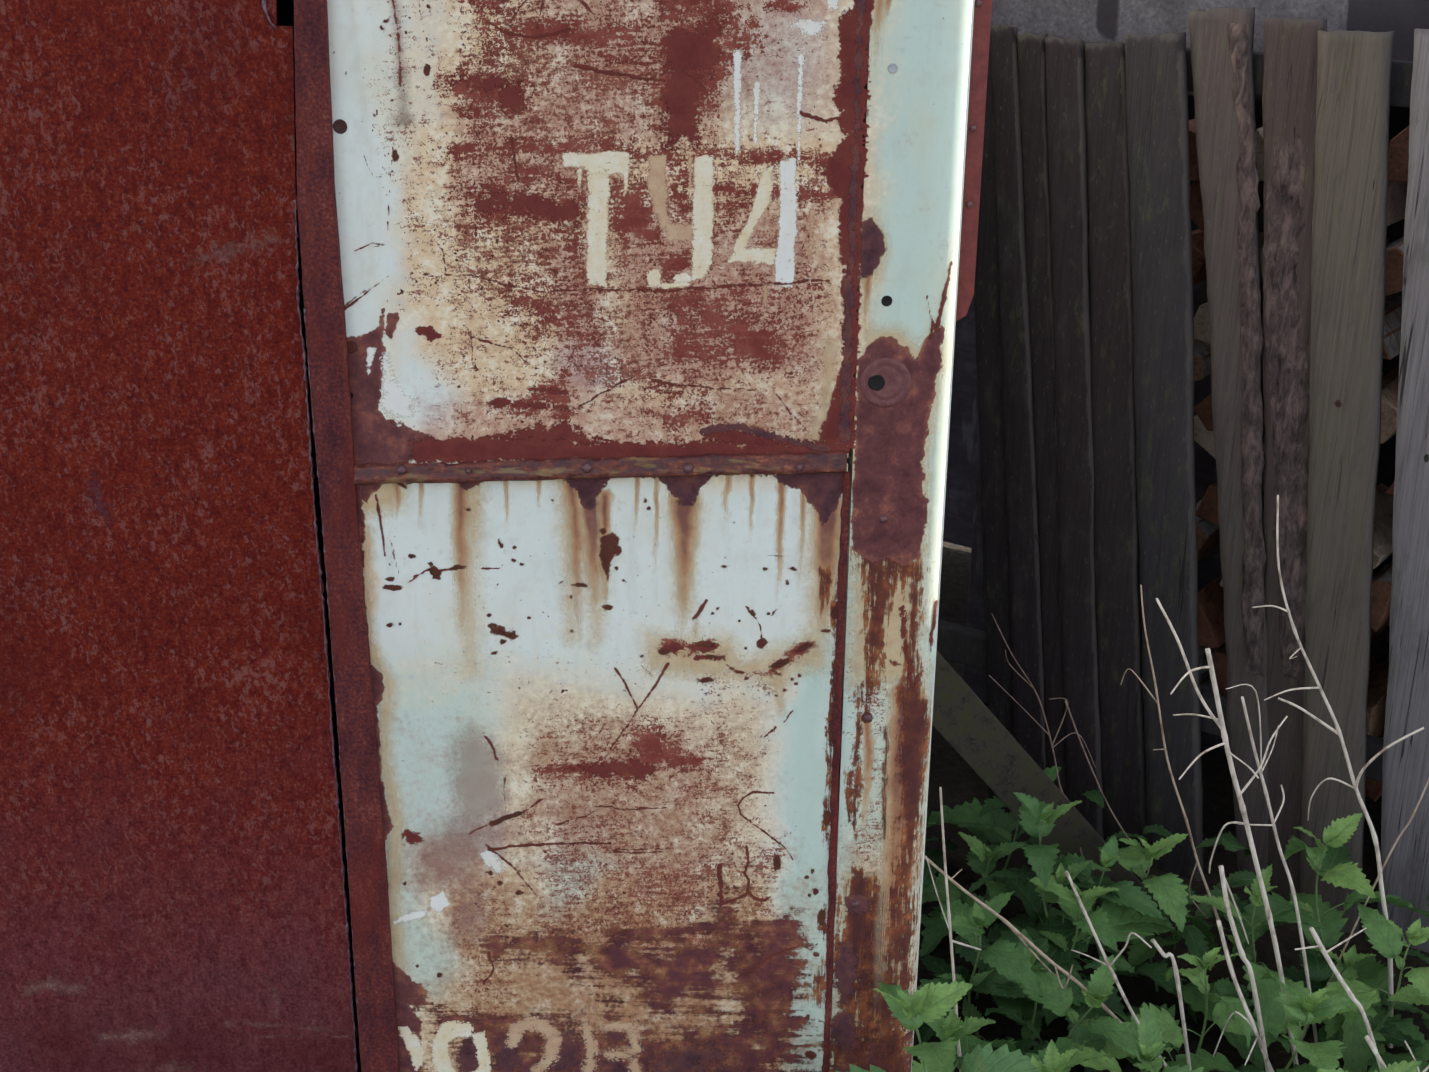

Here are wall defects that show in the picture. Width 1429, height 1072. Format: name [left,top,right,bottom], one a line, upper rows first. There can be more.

peeling [347,308,444,466]
spalling [599,528,622,597]
rust [356,0,938,1072]
spalling [488,623,518,655]
peeling [654,638,819,706]
peeling [480,849,504,873]
peeling [393,891,450,925]